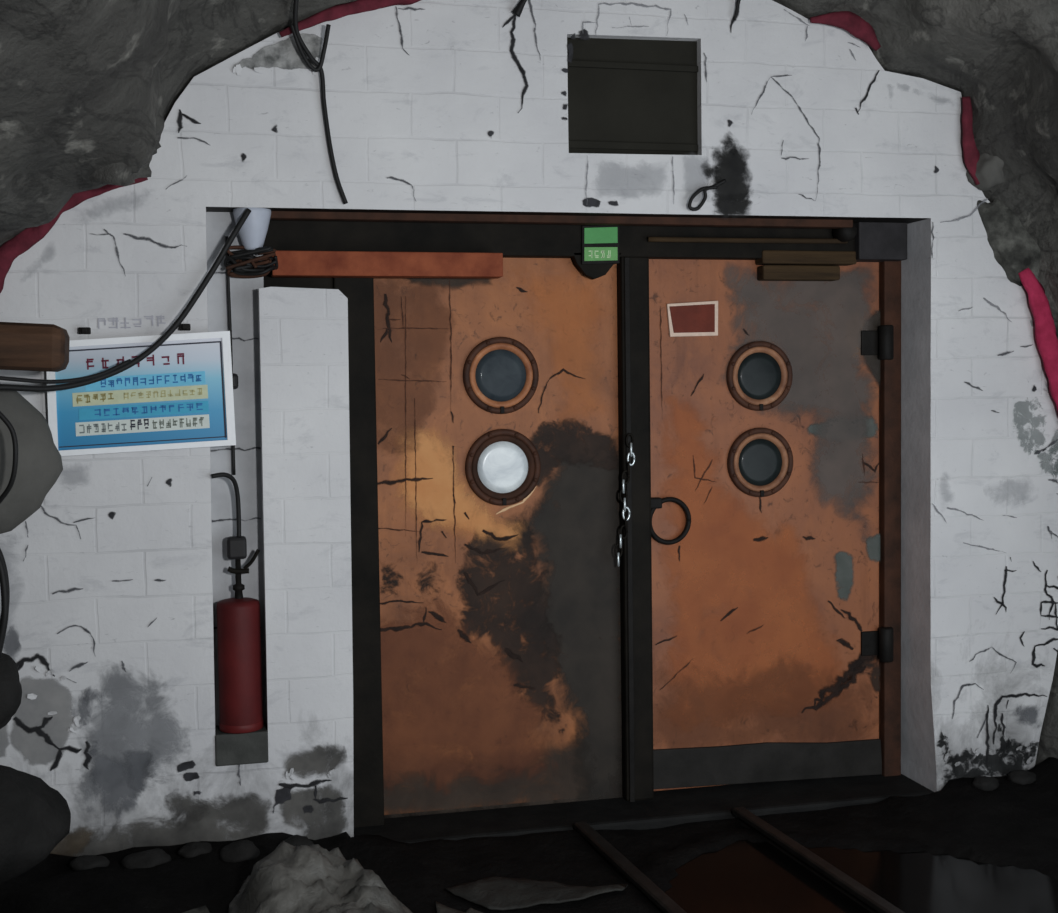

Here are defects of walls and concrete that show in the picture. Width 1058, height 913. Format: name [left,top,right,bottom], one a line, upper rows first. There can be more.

crack [503,0,541,113]
crack [752,75,821,201]
corrosion [402,432,516,540]
crack [933,504,1017,520]
water stain [1014,401,1058,477]
water stain [4,628,21,659]
crack [952,543,1058,771]
crack [14,716,92,771]
water stain [66,670,270,857]